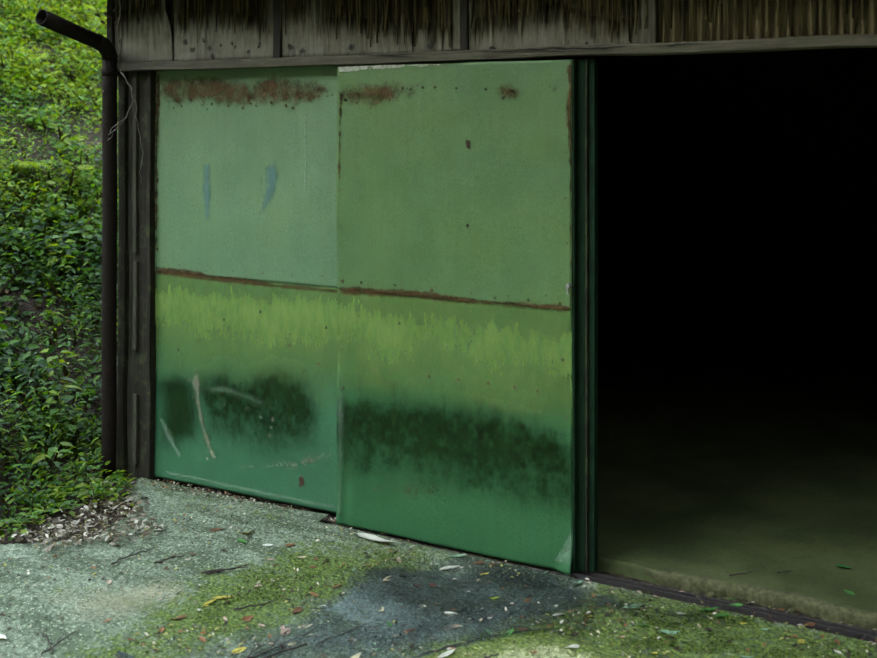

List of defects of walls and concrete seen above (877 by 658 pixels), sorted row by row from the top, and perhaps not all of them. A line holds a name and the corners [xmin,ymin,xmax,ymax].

rust [155,75,436,250]
rust [156,267,569,311]
leakage [162,375,314,439]
leakage [337,400,572,497]